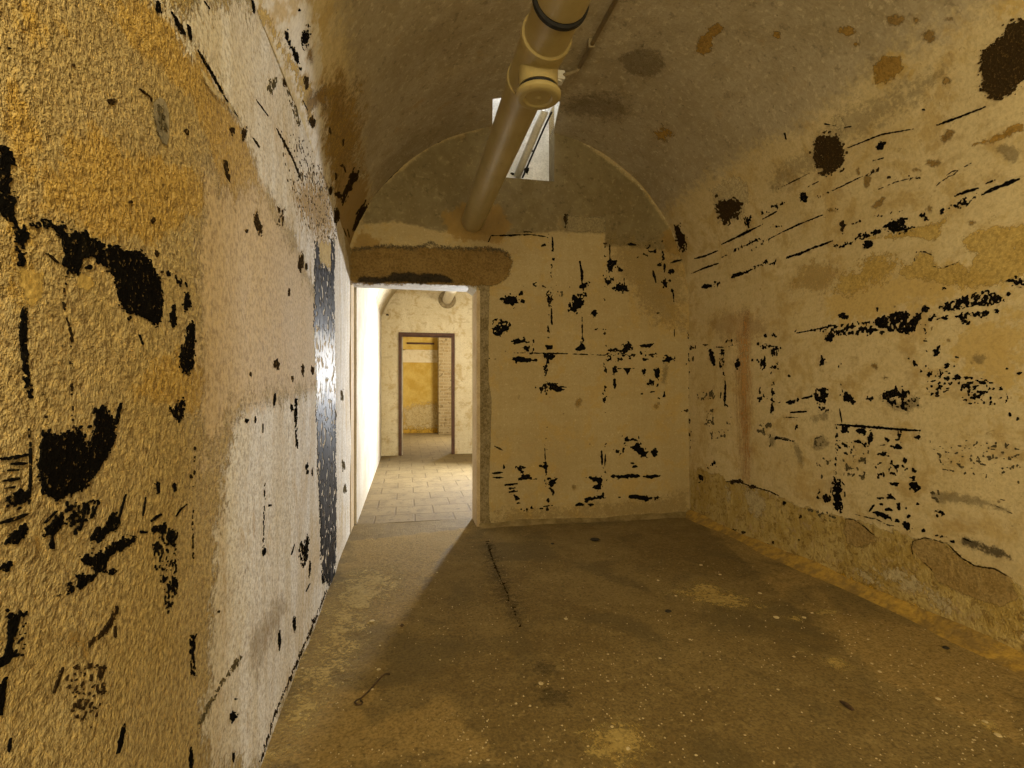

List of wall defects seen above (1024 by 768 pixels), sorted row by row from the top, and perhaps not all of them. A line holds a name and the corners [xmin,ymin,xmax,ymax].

peeling [0,145,197,399]
peeling [492,237,606,393]
water stain [681,202,785,274]
water stain [701,178,1020,289]
peeling [834,219,1024,298]
water stain [313,238,337,587]
peeling [602,341,675,403]
peeling [0,403,188,614]
peeling [492,448,558,512]
peeling [575,435,661,507]
spalling [689,324,1020,617]
crack [485,541,521,627]